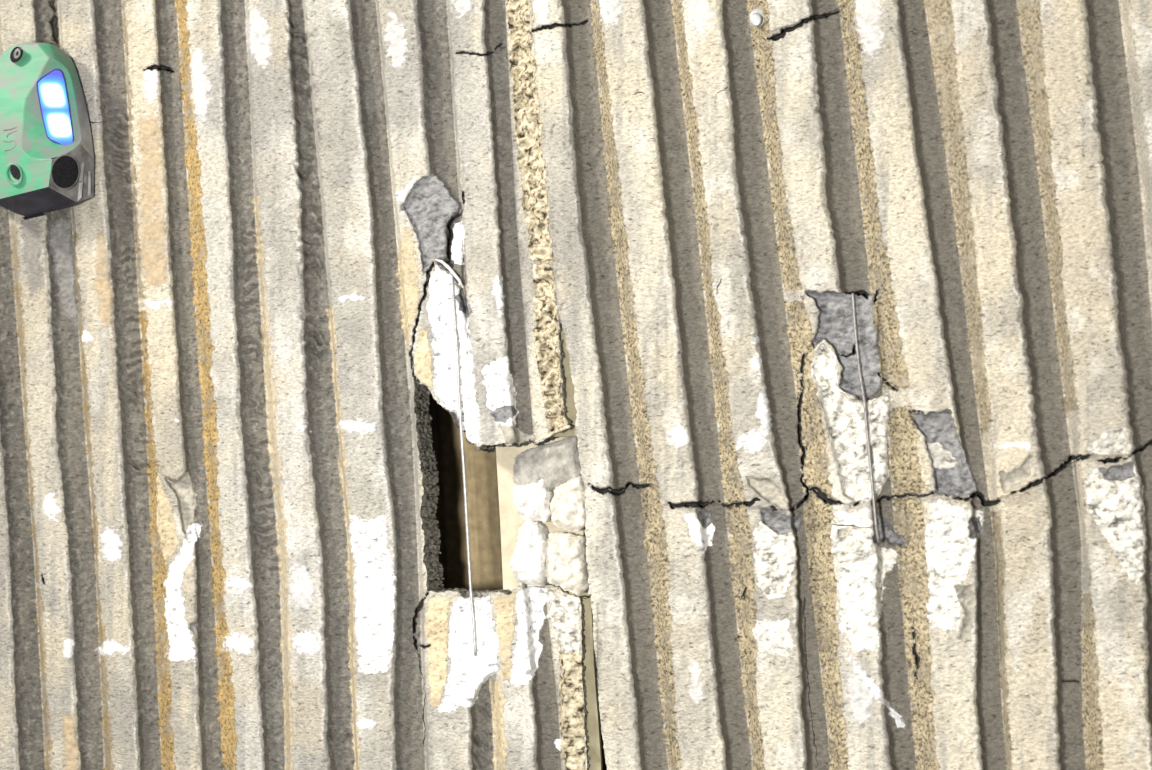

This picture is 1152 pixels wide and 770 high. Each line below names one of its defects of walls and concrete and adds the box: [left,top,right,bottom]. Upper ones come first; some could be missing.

crack [456,43,501,56]
crack [528,20,588,32]
crack [767,11,840,40]
spalling [396,174,536,444]
spalling [805,290,906,653]
crack [589,354,1152,528]
spalling [913,408,984,640]
spalling [437,587,581,713]